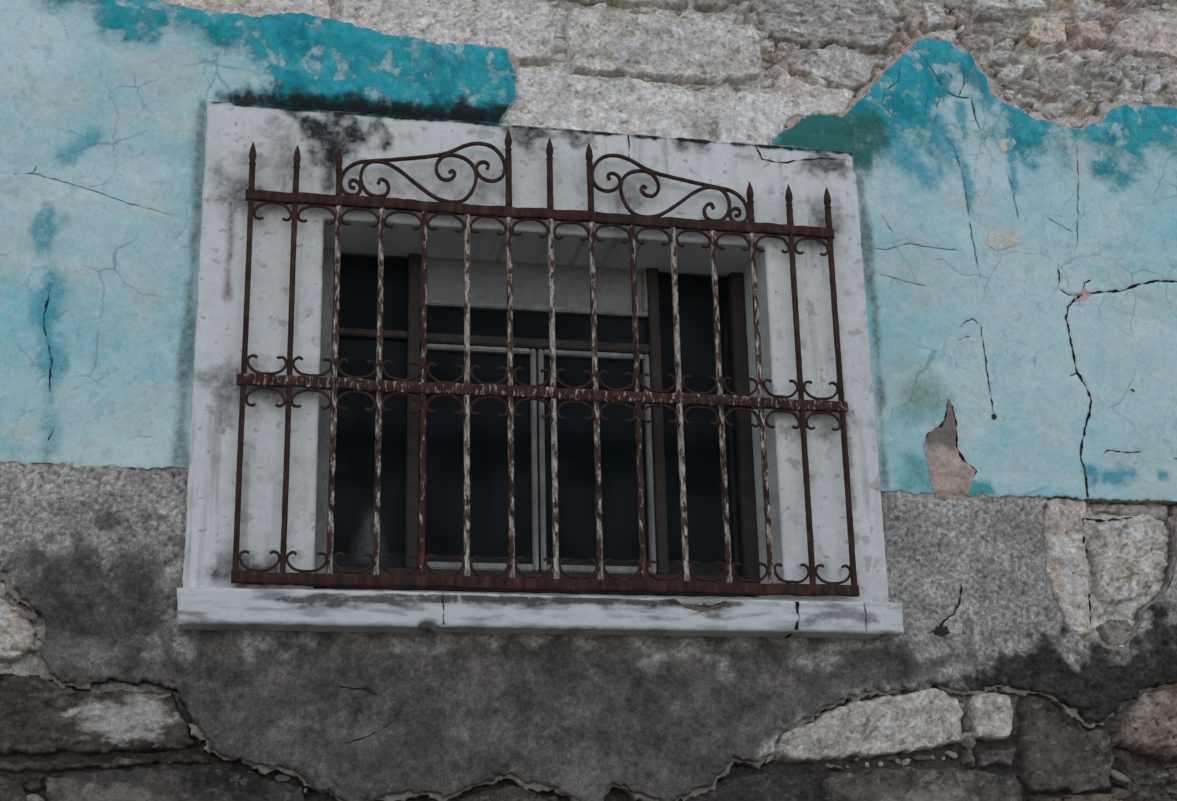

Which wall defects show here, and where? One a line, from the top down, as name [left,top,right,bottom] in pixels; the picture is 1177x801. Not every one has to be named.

damp [90,0,619,189]
damp [676,138,712,147]
flaking render [768,37,936,143]
crack [877,48,982,286]
damp [731,38,1177,302]
spalling [985,231,1020,250]
crack [43,290,53,393]
crack [960,318,994,413]
crack [1049,147,1177,553]
spalling [924,399,977,500]
flaking render [0,572,91,691]
crack [785,602,800,638]